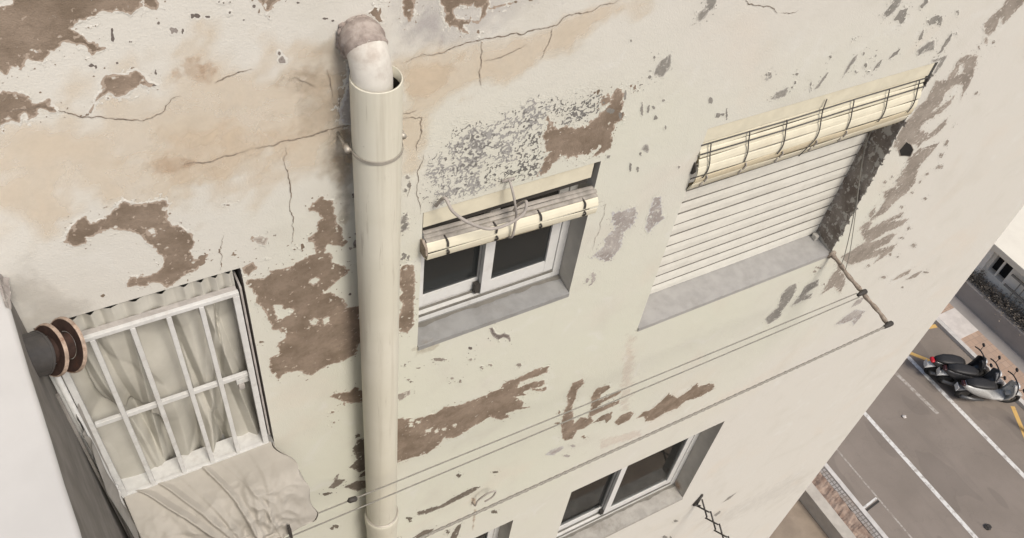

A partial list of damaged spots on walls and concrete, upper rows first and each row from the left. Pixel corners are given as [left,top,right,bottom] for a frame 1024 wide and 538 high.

crack [9,96,179,121]
peeling [0,0,244,134]
crack [187,69,350,243]
crack [404,1,617,83]
peeling [401,50,674,236]
peeling [760,0,1024,327]
peeling [54,193,360,383]
peeling [399,251,420,338]
peeling [582,192,668,288]
peeling [397,356,552,463]
peeling [543,377,717,459]